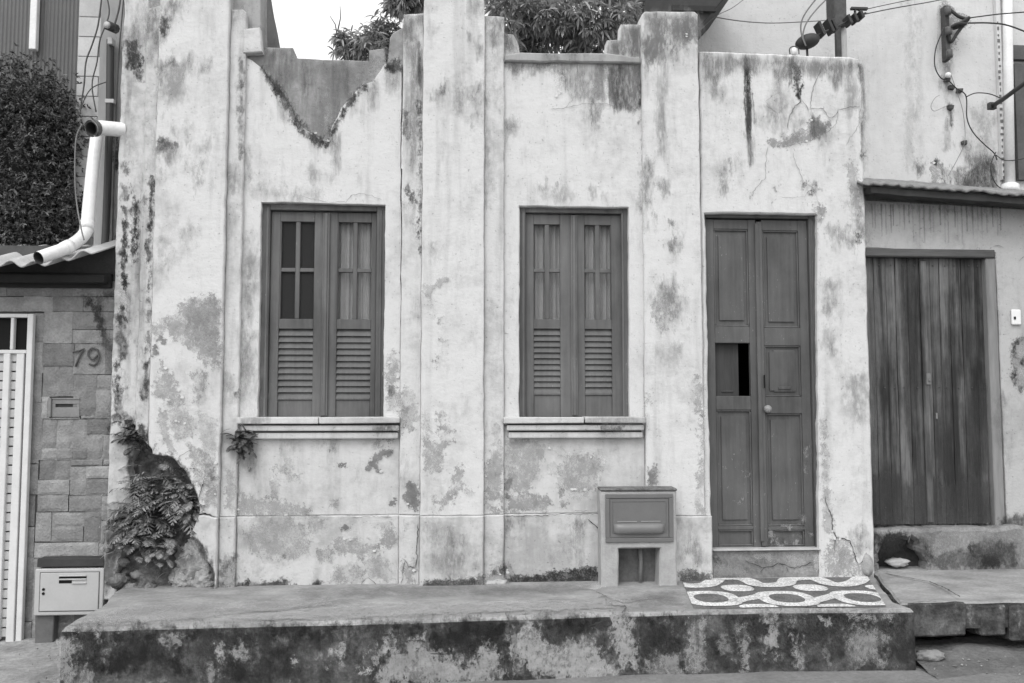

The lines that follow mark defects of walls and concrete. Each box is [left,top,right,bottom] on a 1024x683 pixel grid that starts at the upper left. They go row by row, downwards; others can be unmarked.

water stain [705,55,759,165]
crack [751,67,861,226]
water stain [776,57,865,101]
water stain [85,175,197,507]
spalling [100,293,236,589]
peeling [365,351,410,473]
peeling [389,413,602,515]
crack [825,496,867,565]
water stain [387,615,517,656]
water stain [646,617,707,674]